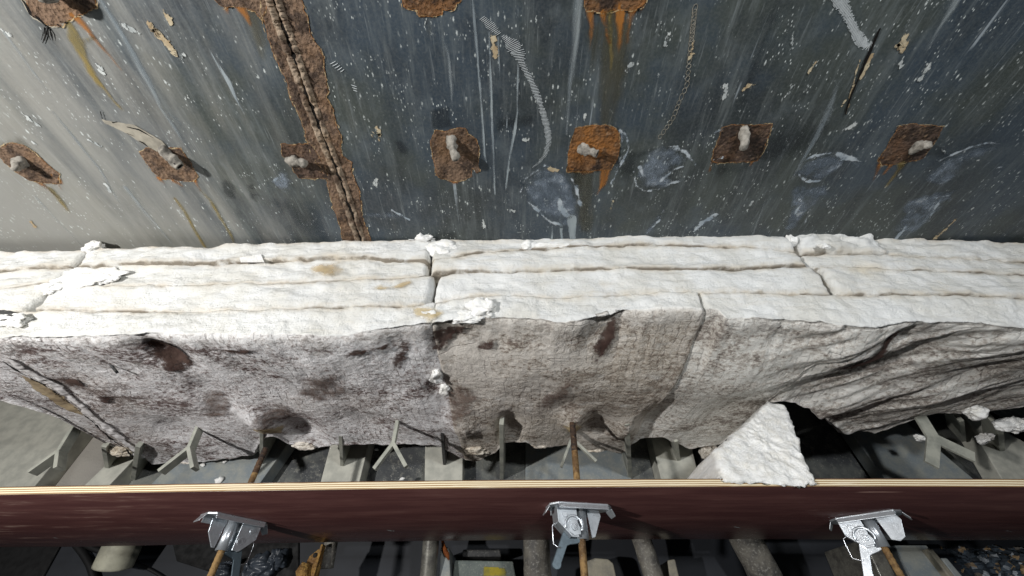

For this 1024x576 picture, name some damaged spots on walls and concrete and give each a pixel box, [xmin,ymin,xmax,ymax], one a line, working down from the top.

rust [25,0,110,96]
rust [584,0,648,45]
rust [0,142,66,208]
peeling [100,111,166,152]
rust [139,147,198,184]
rust [215,0,371,241]
rust [430,127,481,183]
rust [566,124,621,189]
rust [711,123,773,164]
rust [877,123,945,179]
damp [143,340,192,372]
damp [593,317,619,361]